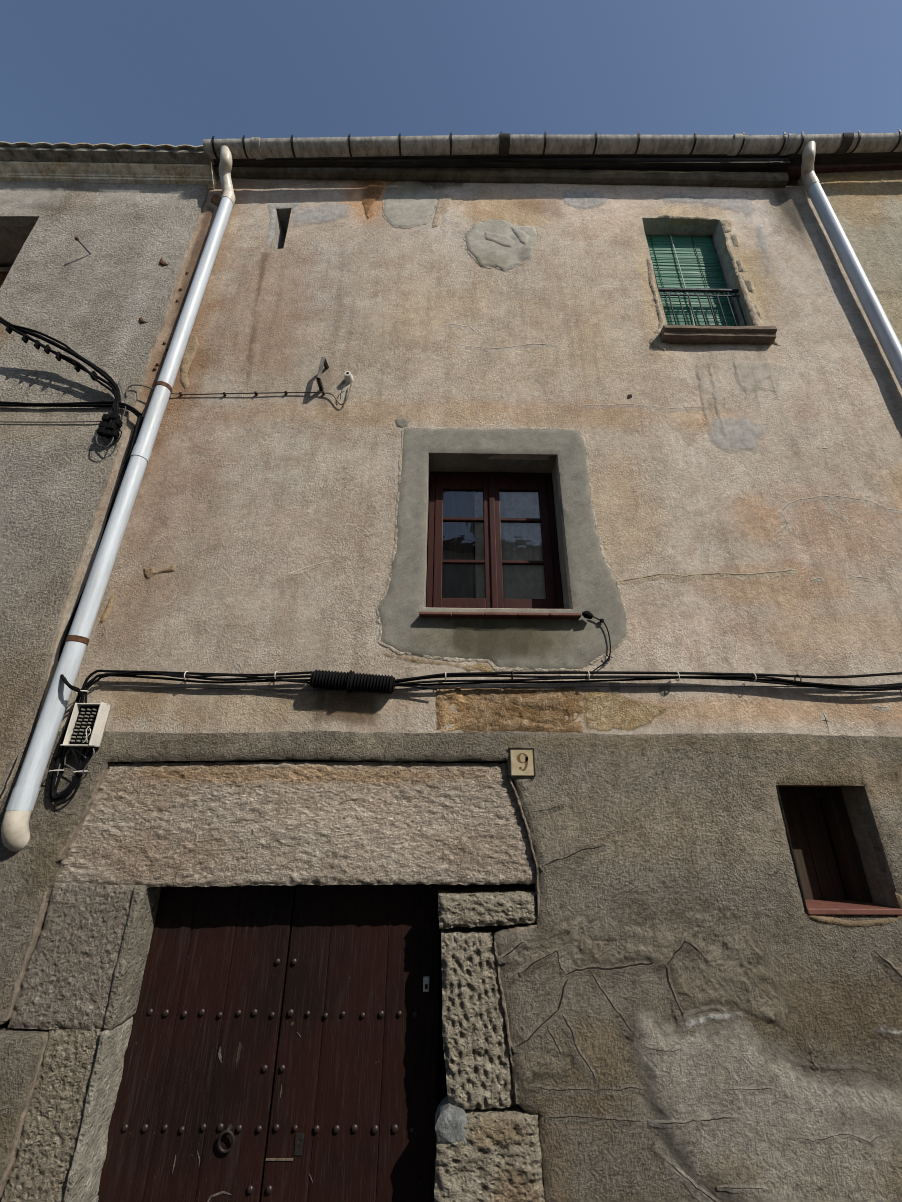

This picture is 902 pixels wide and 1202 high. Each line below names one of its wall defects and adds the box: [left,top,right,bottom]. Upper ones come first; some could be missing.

peeling [484,227,529,247]
flaking render [386,654,492,672]
flaking render [436,686,666,733]
crack [871,947,902,986]
crack [496,938,778,1202]
crack [786,1103,888,1146]